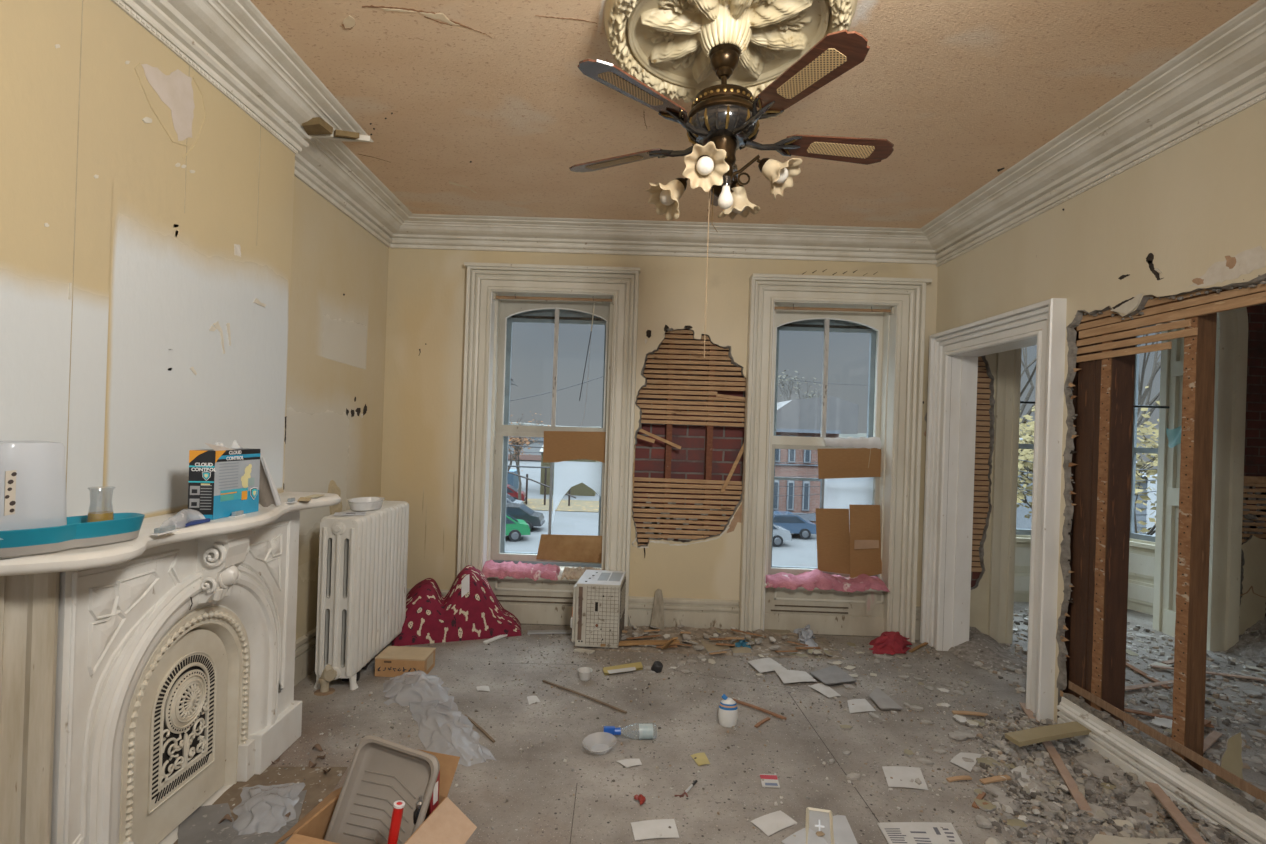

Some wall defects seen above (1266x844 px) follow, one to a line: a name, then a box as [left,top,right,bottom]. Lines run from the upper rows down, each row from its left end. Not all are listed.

flaking render [632,325,746,558]
flaking render [970,353,997,635]
spalling [1056,245,1266,689]